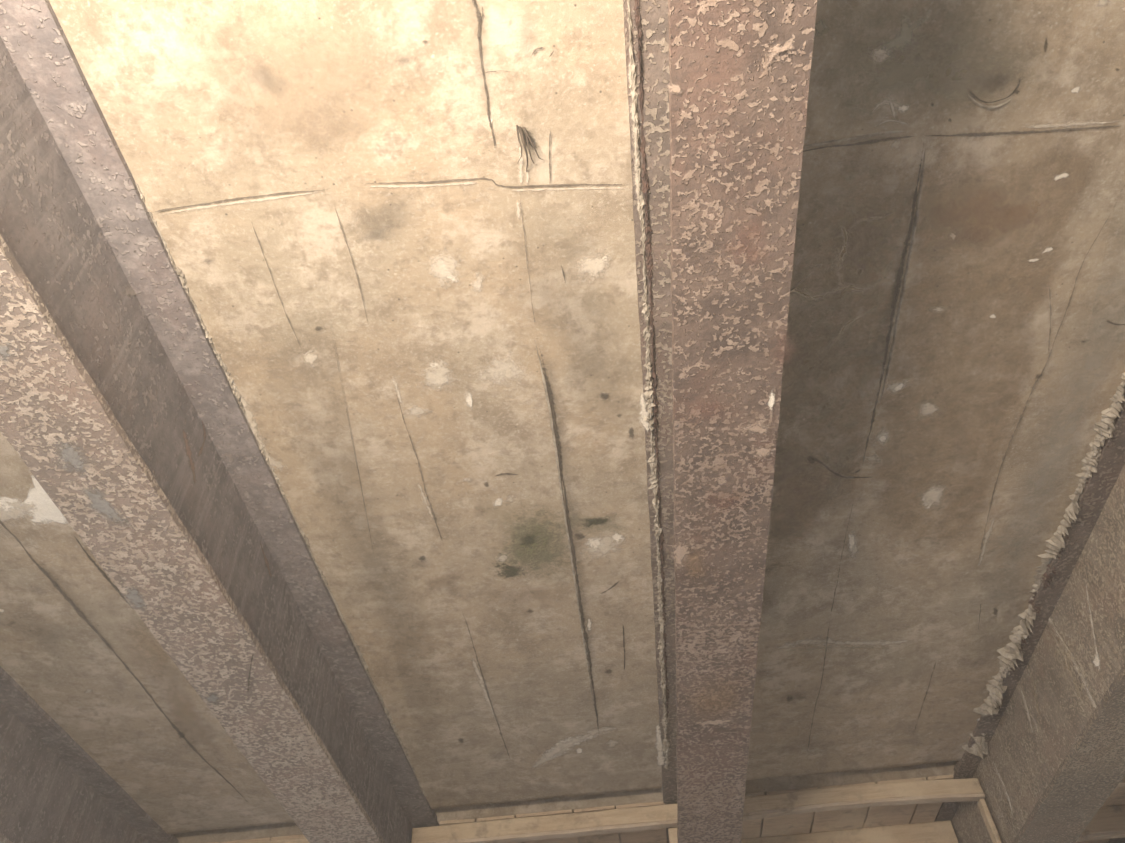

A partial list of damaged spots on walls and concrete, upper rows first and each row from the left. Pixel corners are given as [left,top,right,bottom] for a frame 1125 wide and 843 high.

crack [472,0,511,146]
crack [336,211,368,321]
crack [393,377,442,538]
crack [0,520,244,798]
crack [465,620,509,755]